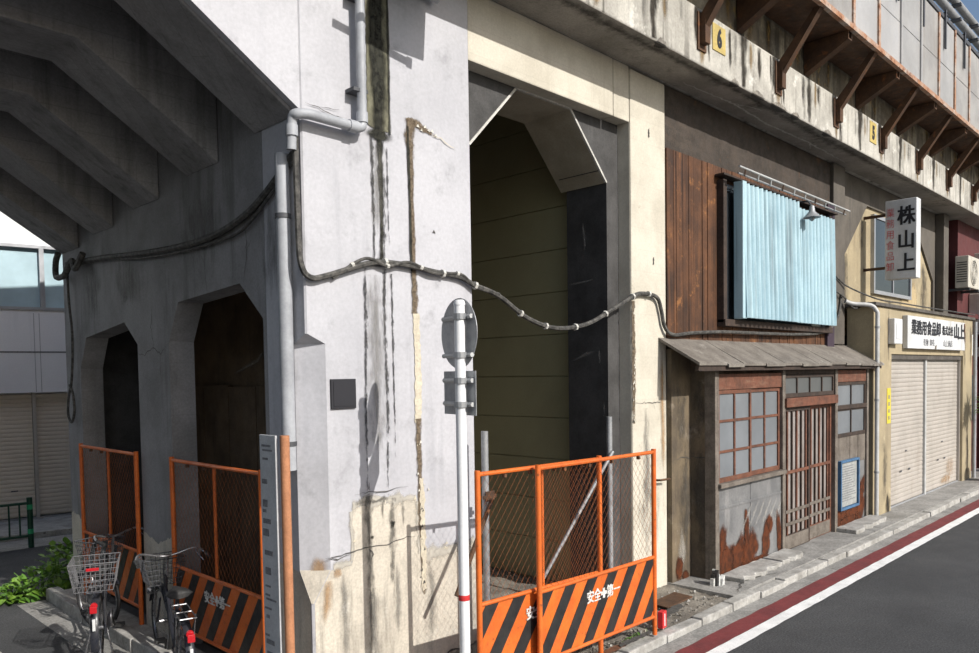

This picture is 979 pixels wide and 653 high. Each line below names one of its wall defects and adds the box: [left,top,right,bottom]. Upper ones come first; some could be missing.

damp [563,0,624,32]
damp [634,0,885,170]
damp [895,126,921,180]
damp [364,0,396,484]
peeling [280,117,477,653]
damp [357,458,404,651]
corrosion [719,509,781,575]
corrosion [838,476,865,527]